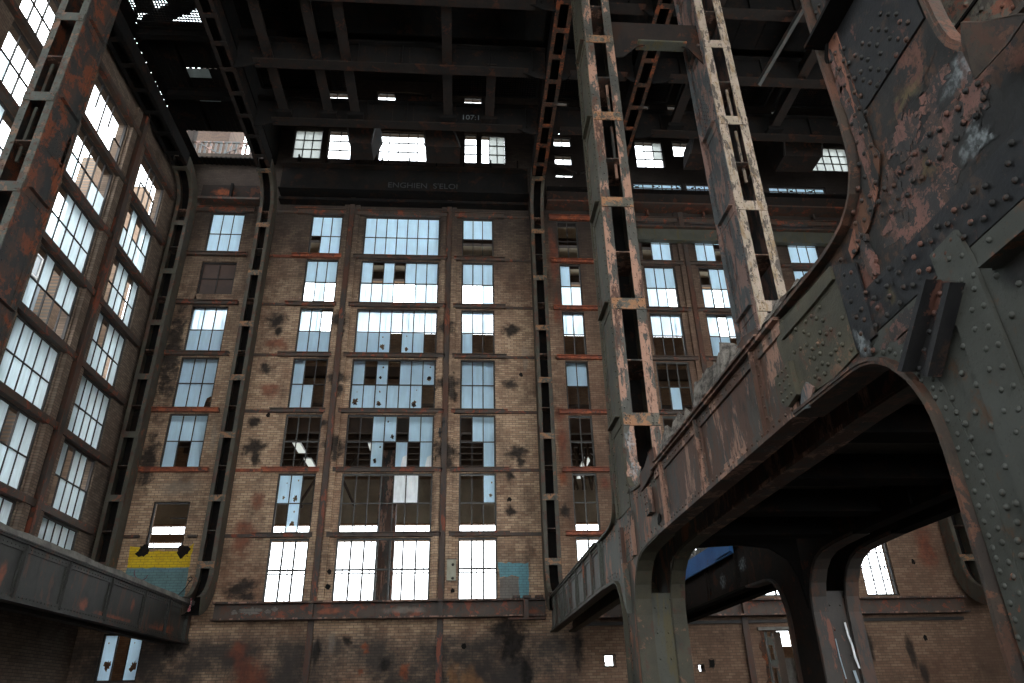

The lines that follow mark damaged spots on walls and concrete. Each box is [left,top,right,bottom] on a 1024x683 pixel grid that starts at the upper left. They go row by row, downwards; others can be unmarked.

water stain [483,618,540,683]